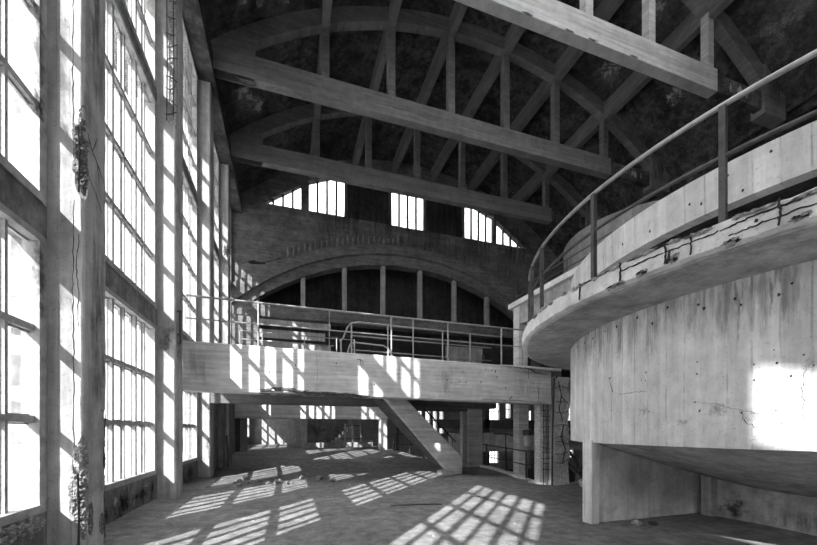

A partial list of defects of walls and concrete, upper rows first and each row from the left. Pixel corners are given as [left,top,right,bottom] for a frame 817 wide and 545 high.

crack [72,0,105,213]
spalling [71,105,90,196]
spalling [731,202,778,221]
spalling [788,209,813,223]
spalling [792,188,817,200]
spalling [609,247,657,272]
spalling [664,228,713,265]
spalling [721,236,741,249]
crack [71,205,79,438]
crack [485,366,568,464]
spalling [67,415,155,545]